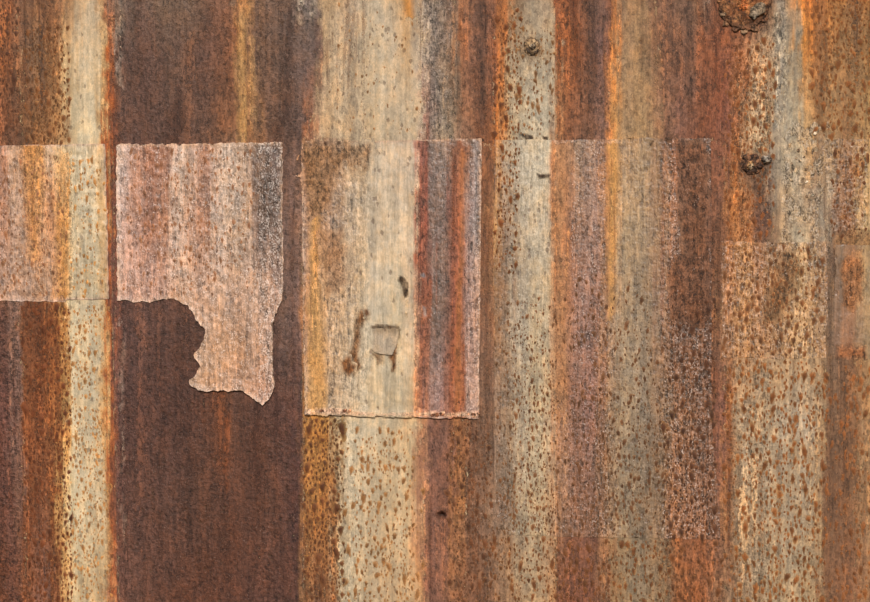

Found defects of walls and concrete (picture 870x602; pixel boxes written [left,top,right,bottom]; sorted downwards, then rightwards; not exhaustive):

rust [0,0,643,602]
rust [626,0,870,602]